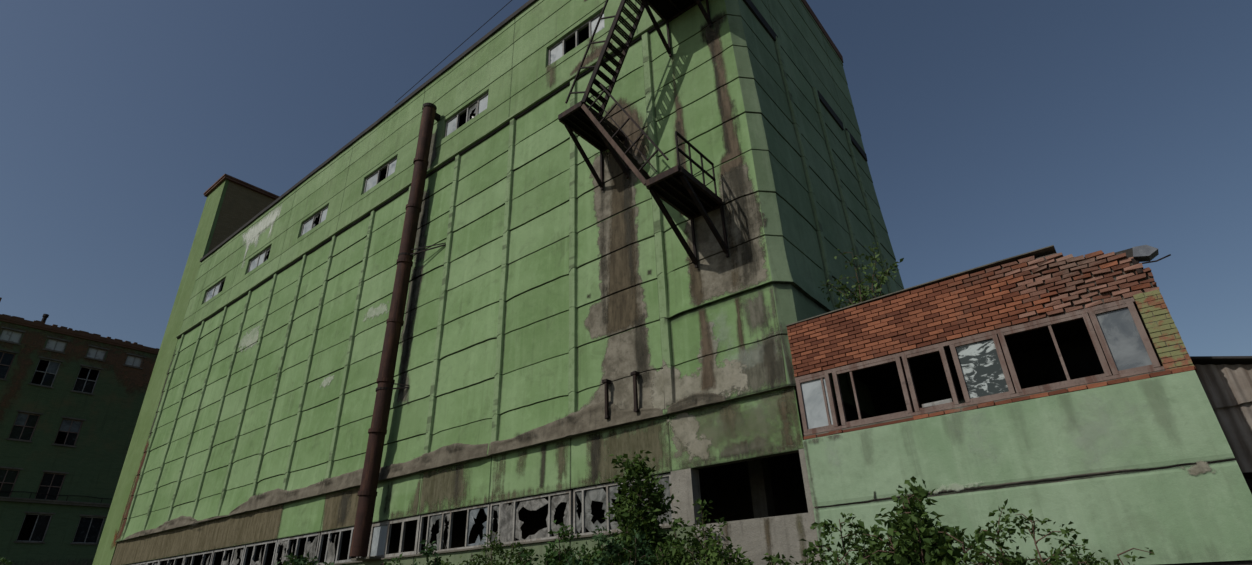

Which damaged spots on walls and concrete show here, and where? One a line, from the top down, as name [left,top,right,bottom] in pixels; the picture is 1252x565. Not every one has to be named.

leakage [579,99,839,485]
flaking render [0,326,156,419]
leakage [384,441,567,518]
peeling [667,413,714,460]